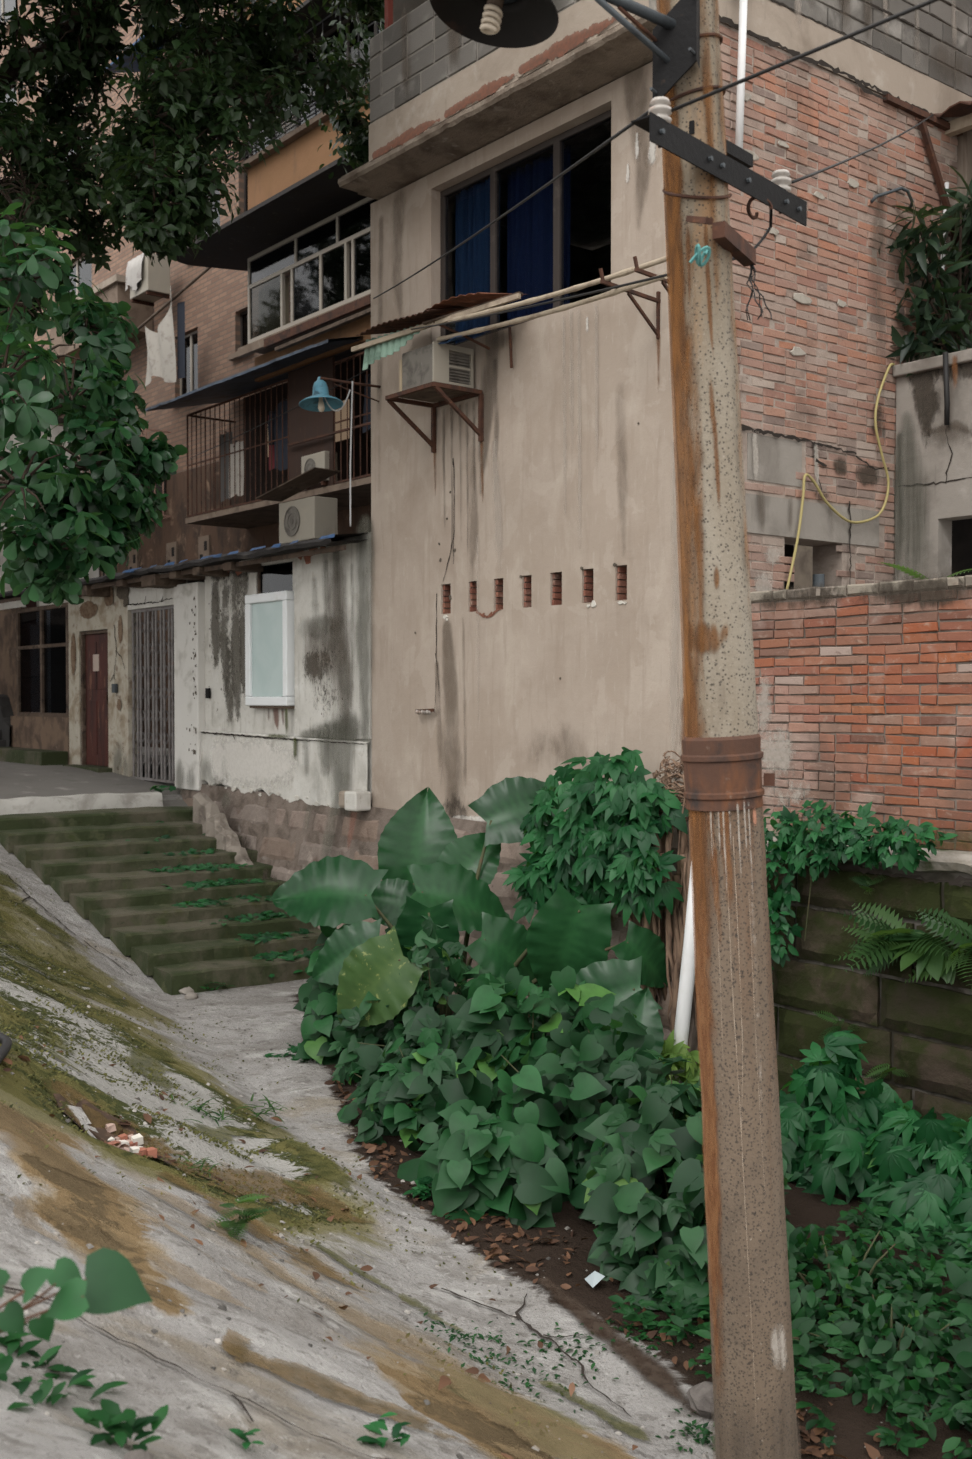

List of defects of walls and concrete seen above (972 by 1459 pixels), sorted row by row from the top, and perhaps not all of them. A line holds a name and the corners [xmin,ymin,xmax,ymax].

corrosion [656,0,669,15]
corrosion [703,42,726,150]
corrosion [657,148,727,753]
crack [741,424,972,577]
water stain [210,571,249,722]
water stain [304,644,344,709]
corrosion [689,810,732,1358]
crack [441,1288,631,1417]